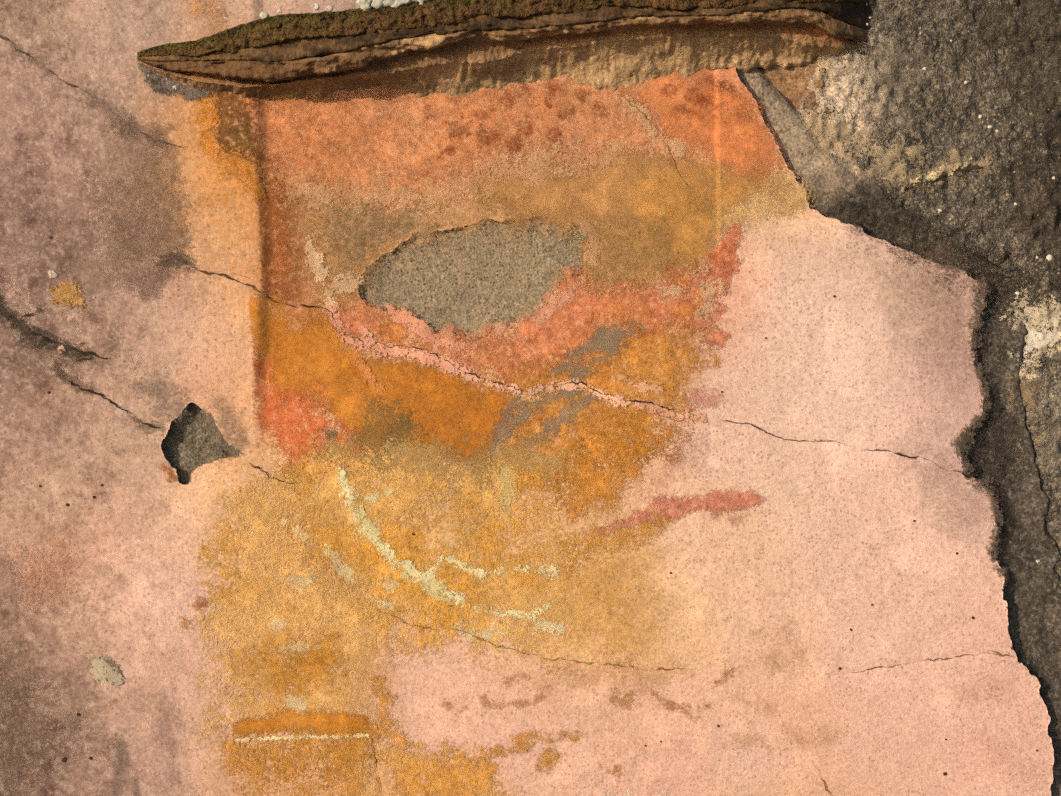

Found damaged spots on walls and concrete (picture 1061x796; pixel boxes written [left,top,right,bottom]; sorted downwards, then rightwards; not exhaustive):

corrosion [193,96,264,200]
spalling [797,28,1001,209]
crack [0,295,160,434]
spalling [305,216,742,385]
crack [173,261,978,480]
spalling [1000,289,1061,445]
spalling [162,402,241,484]
corrosion [481,695,544,709]
corrosion [652,691,710,719]
crack [833,650,1013,675]